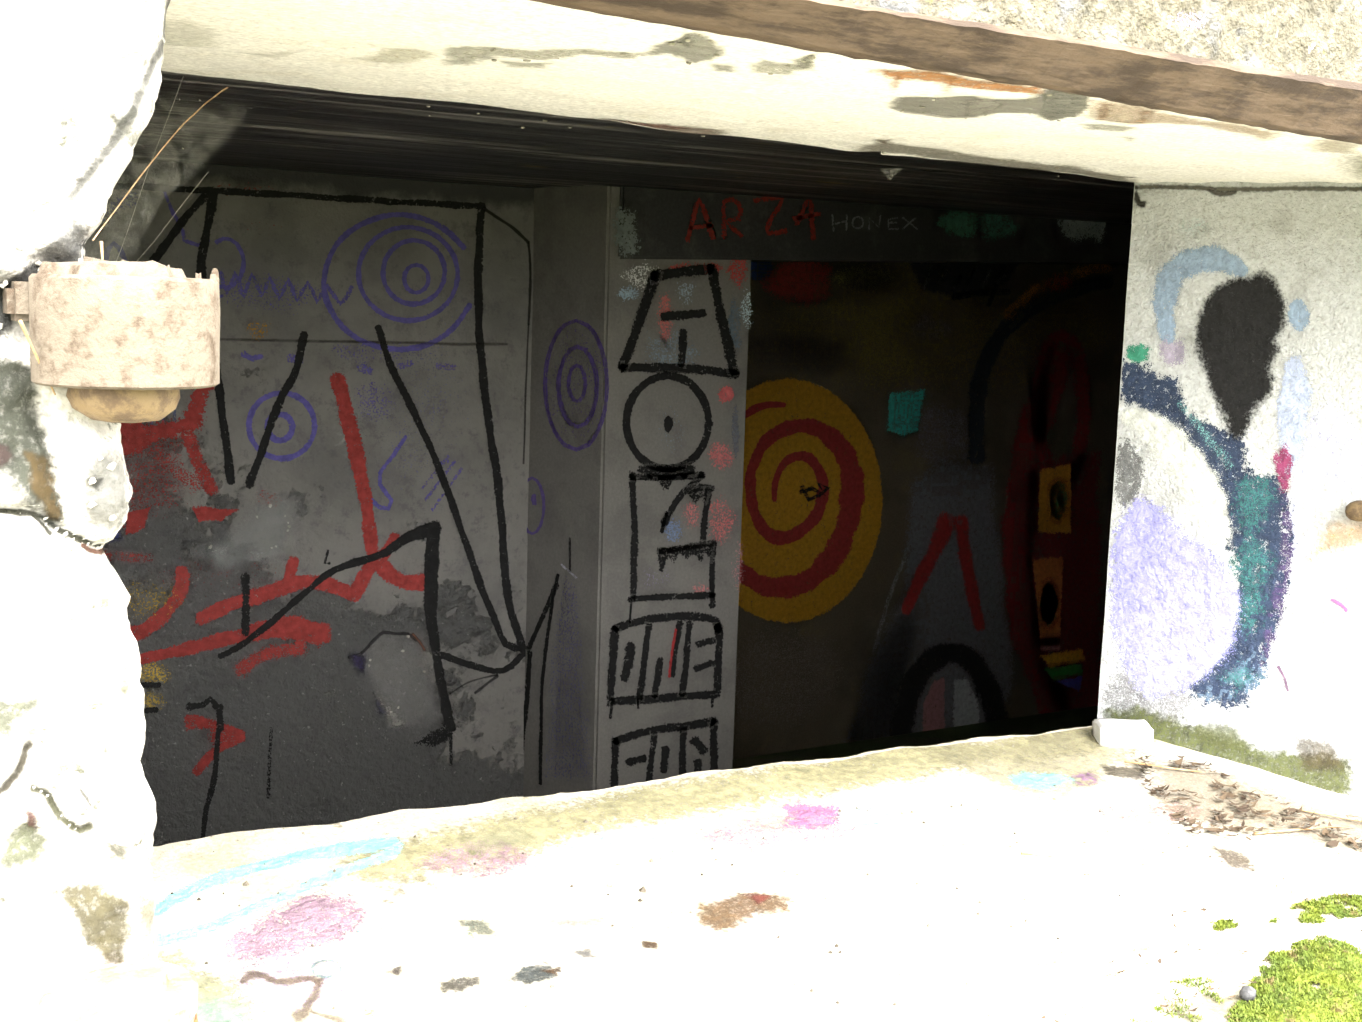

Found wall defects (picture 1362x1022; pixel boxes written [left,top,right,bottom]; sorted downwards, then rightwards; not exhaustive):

spalling [448,34,732,72]
corrosion [880,70,1043,94]
spalling [891,89,1131,131]
corrosion [37,256,186,278]